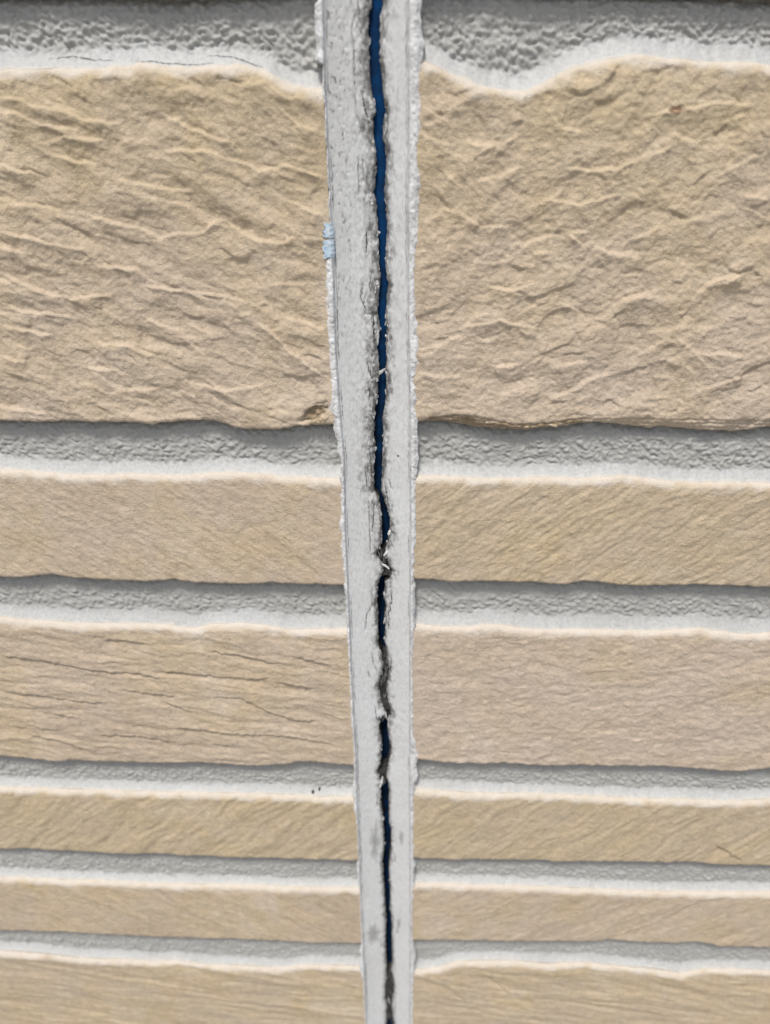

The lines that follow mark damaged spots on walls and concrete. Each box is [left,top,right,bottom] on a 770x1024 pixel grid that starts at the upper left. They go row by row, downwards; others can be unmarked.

crack [326,0,409,1024]